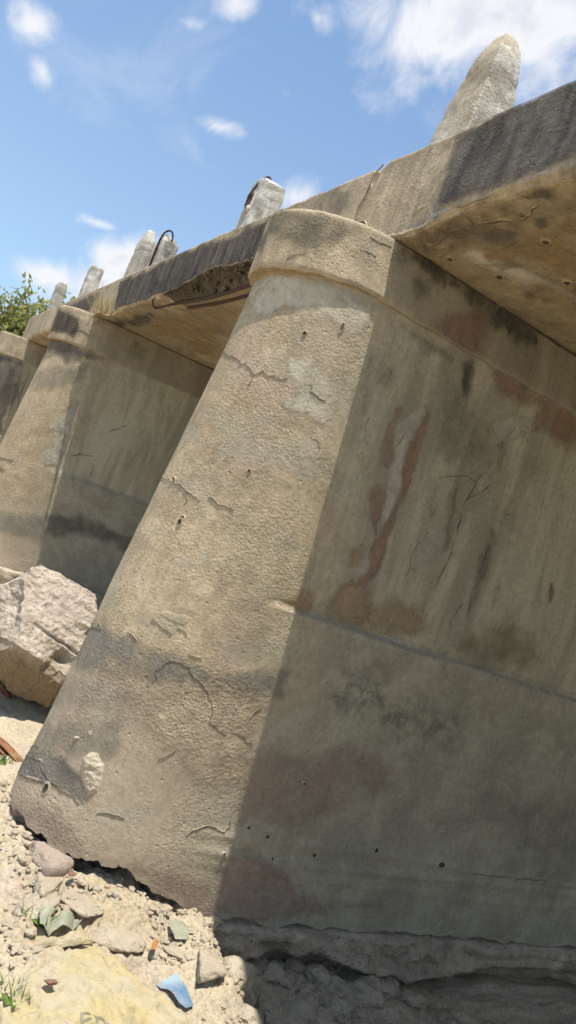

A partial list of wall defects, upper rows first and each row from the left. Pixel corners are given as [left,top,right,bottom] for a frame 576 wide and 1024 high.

damp [440,80,576,202]
crack [356,164,390,257]
spalling [152,263,251,310]
crack [222,352,287,388]
rust [352,409,428,586]
crack [403,416,529,591]
crack [127,620,262,744]